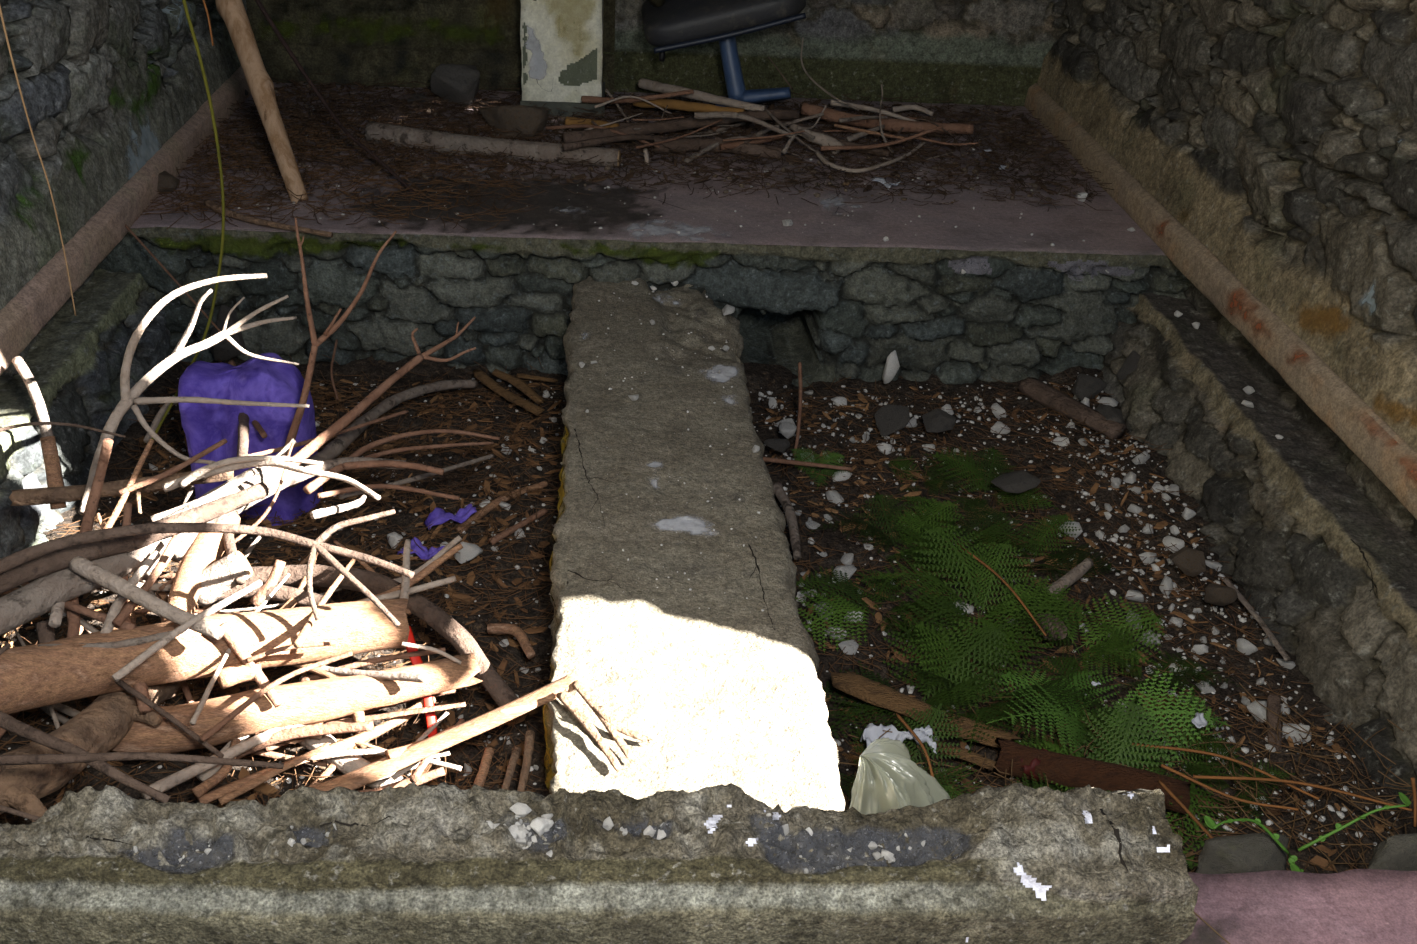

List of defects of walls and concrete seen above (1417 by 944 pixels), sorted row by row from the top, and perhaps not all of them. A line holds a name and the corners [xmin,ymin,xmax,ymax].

flaking render [522,22,597,86]
crack [748,544,786,630]